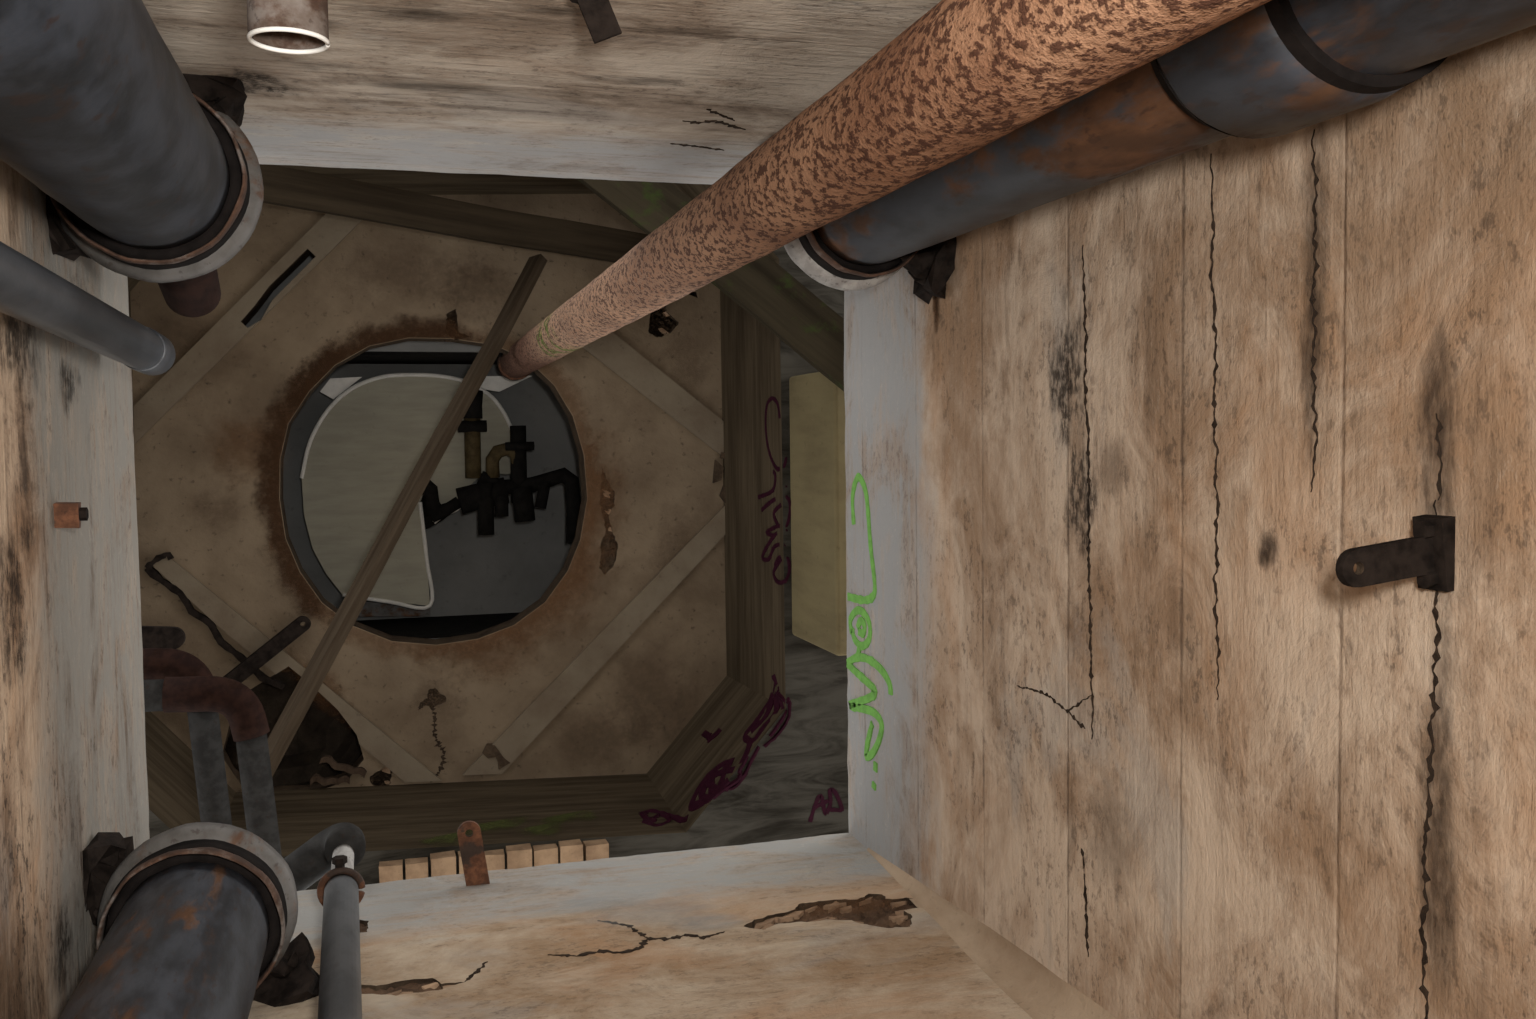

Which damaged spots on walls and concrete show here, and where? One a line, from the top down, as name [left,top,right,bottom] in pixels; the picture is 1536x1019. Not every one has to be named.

rust [257,318,472,615]
crack [1017,245,1094,739]
water stain [1050,322,1096,555]
crack [1209,154,1221,700]
crack [1309,129,1320,492]
crack [1433,413,1443,515]
spalling [361,981,453,996]
crack [465,961,488,982]
crack [548,920,725,957]
spalling [754,897,917,930]
crack [1419,590,1442,1019]